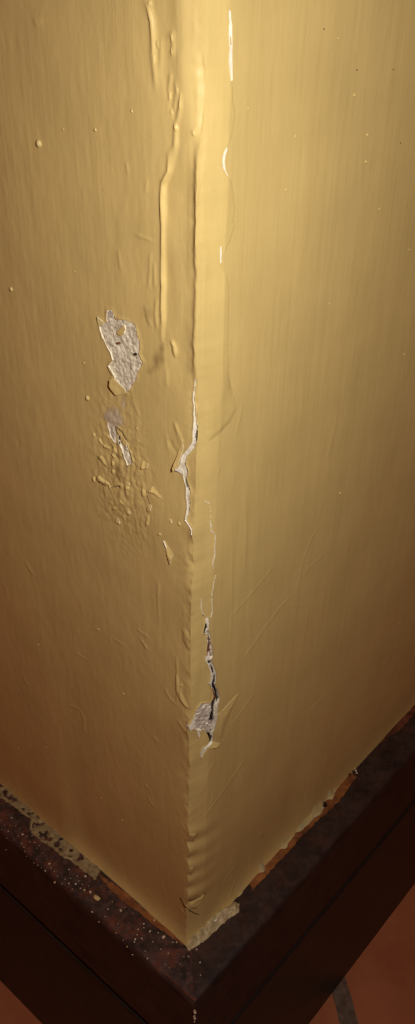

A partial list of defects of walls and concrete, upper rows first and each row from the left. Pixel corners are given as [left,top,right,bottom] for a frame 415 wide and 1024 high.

peeling [92,305,173,565]
crack [172,375,220,705]